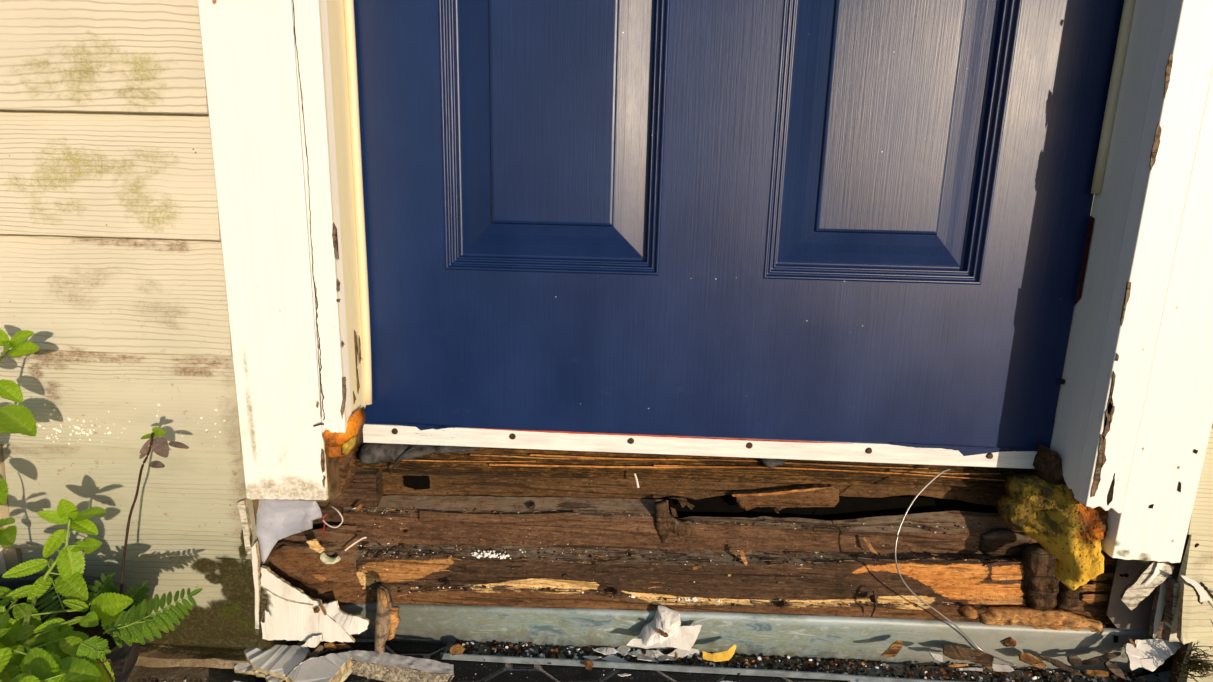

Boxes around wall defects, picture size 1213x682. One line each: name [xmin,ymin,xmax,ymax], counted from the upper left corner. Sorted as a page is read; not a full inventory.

peeling [1164,53,1173,98]
peeling [1149,123,1162,171]
peeling [1120,281,1131,326]
peeling [1090,353,1119,513]
peeling [307,539,325,553]
peeling [357,559,453,590]
spalling [1175,534,1199,570]
peeling [852,563,1122,633]
peeling [301,635,323,648]
spalling [1145,654,1175,674]